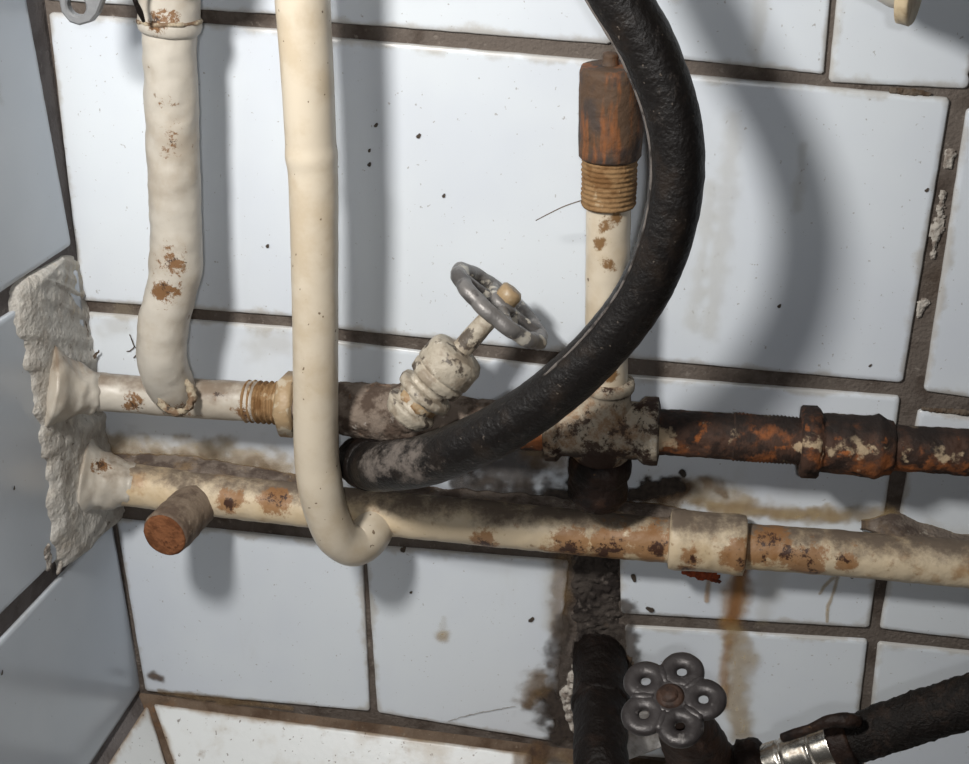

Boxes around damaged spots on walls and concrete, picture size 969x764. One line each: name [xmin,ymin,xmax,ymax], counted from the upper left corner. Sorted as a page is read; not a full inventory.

water stain [943,148,957,169]
water stain [925,188,947,259]
water stain [916,298,930,318]
corrosion [729,569,746,620]